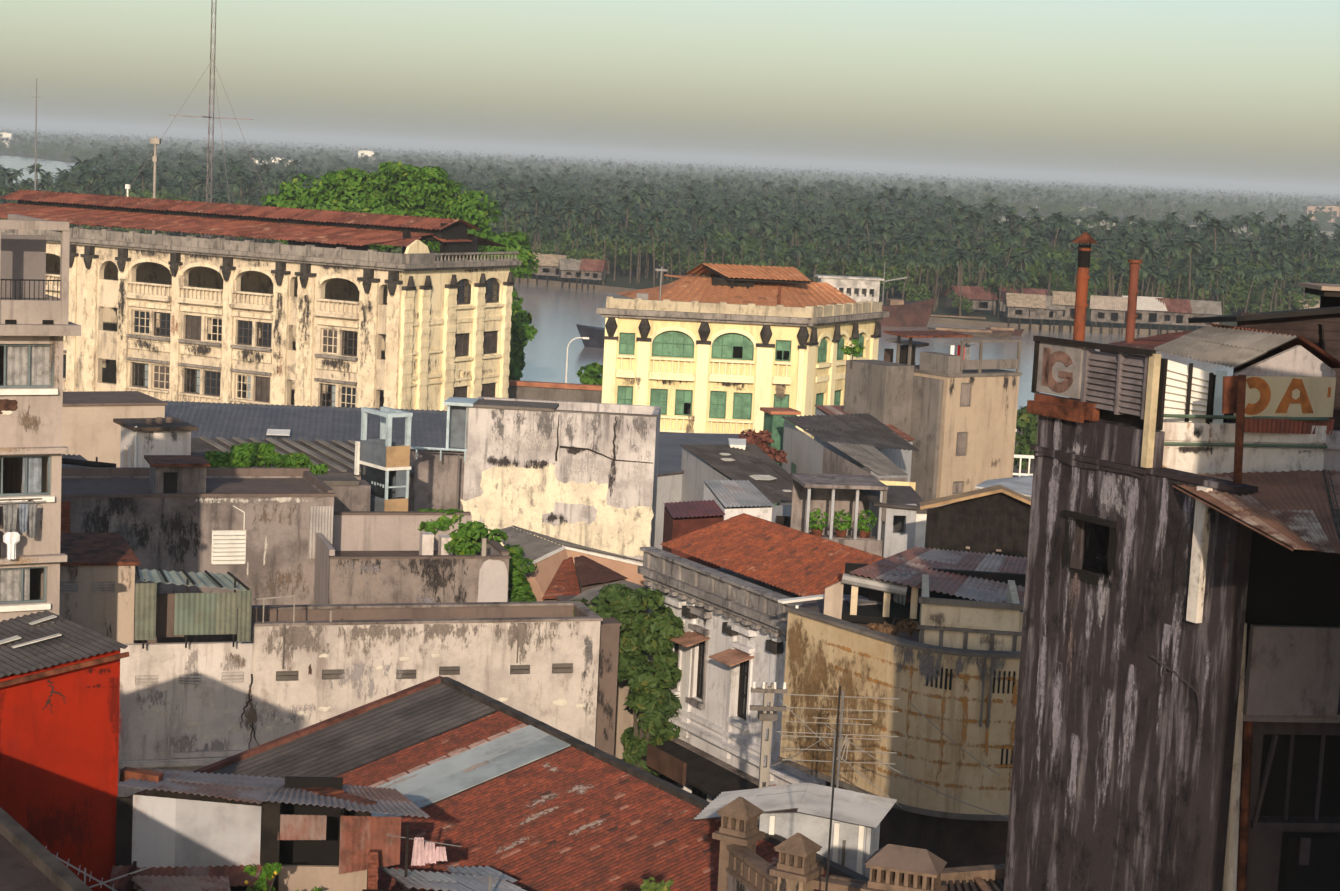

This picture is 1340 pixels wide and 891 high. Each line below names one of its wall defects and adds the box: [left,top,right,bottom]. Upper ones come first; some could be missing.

damp [487,409,651,497]
damp [1179,426,1218,454]
damp [195,497,309,598]
peeling [460,463,654,602]
damp [109,677,122,747]
damp [221,653,245,670]
damp [156,685,315,752]
crack [241,674,259,749]
damp [266,622,613,740]
corrosion [823,643,1018,791]
damp [1036,418,1139,891]
damp [1155,478,1215,745]